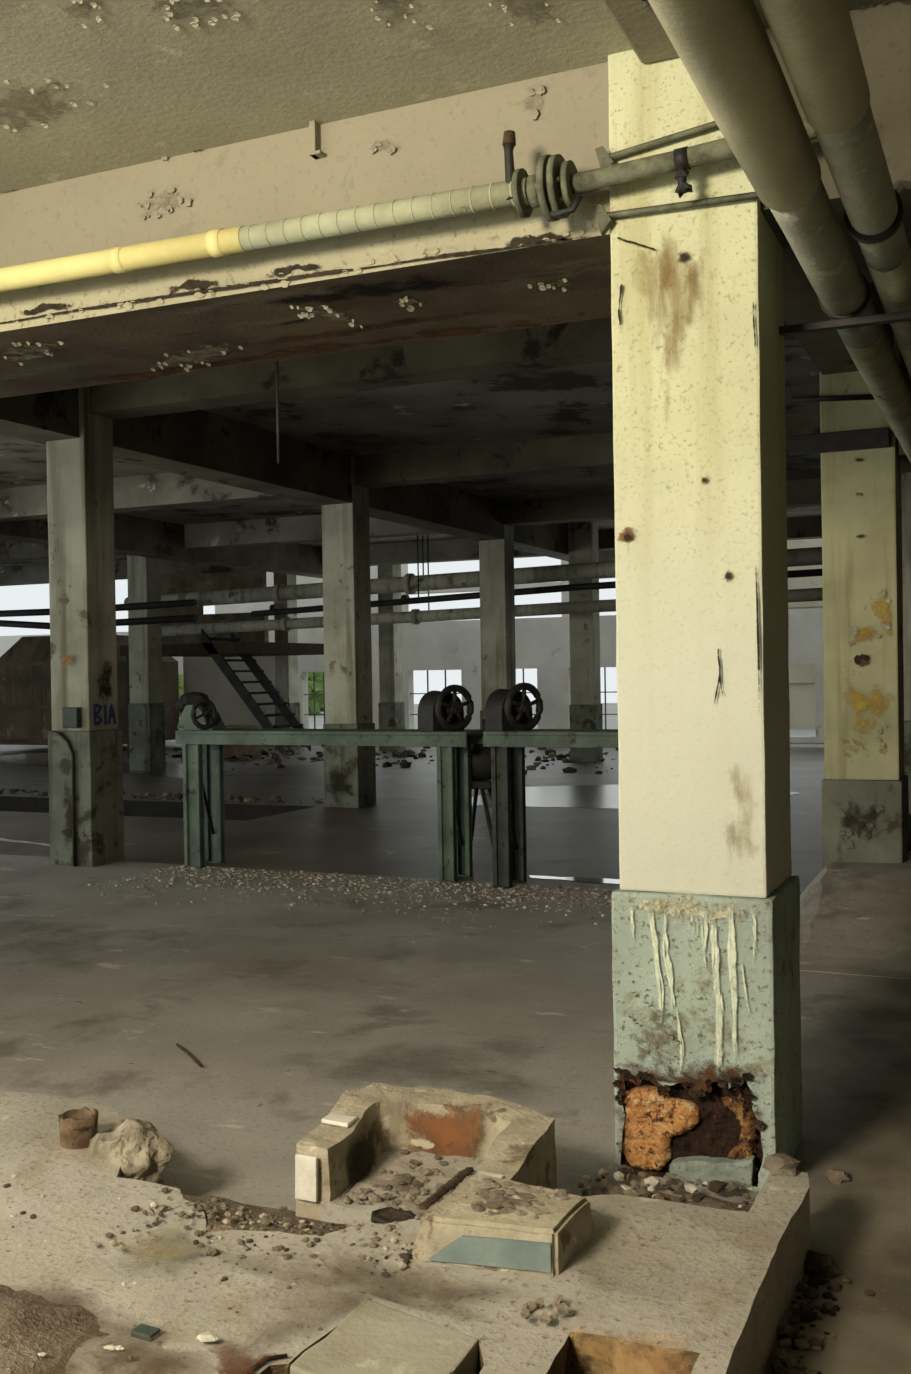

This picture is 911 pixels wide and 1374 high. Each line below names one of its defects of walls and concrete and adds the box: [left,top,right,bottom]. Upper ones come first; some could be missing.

peeling [67,0,102,28]
peeling [155,0,241,31]
peeling [370,0,433,30]
crack [855,0,911,10]
peeling [0,78,94,132]
spalling [0,230,594,366]
efflorescence [624,894,756,1071]
spalling [612,992,765,1186]